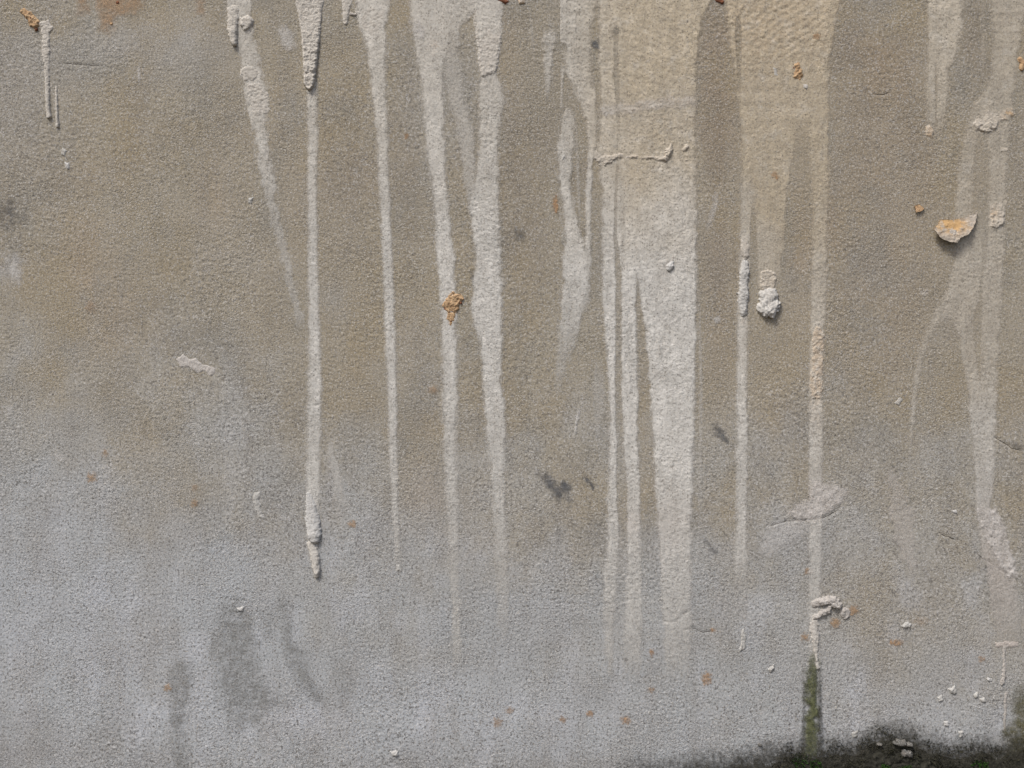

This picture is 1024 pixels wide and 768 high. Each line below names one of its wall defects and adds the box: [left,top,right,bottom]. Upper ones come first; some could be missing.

efflorescence [227,0,276,209]
efflorescence [295,0,324,578]
efflorescence [342,0,399,551]
efflorescence [410,0,506,646]
efflorescence [544,0,712,656]
efflorescence [726,0,840,669]
peeling [933,212,977,243]
efflorescence [911,0,1024,619]